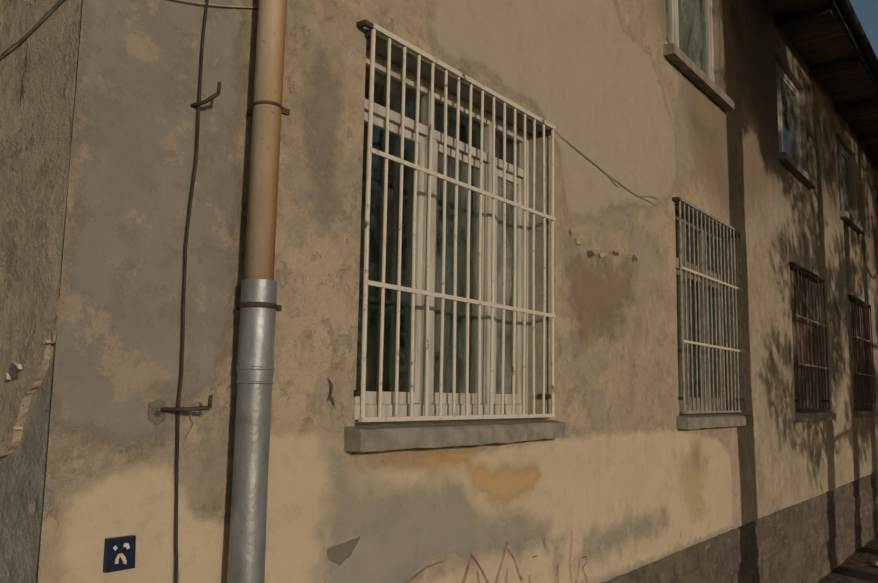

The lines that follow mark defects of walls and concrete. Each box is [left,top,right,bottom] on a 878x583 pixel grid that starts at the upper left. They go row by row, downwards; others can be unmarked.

flaking render [0,340,56,583]
flaking render [327,537,360,565]